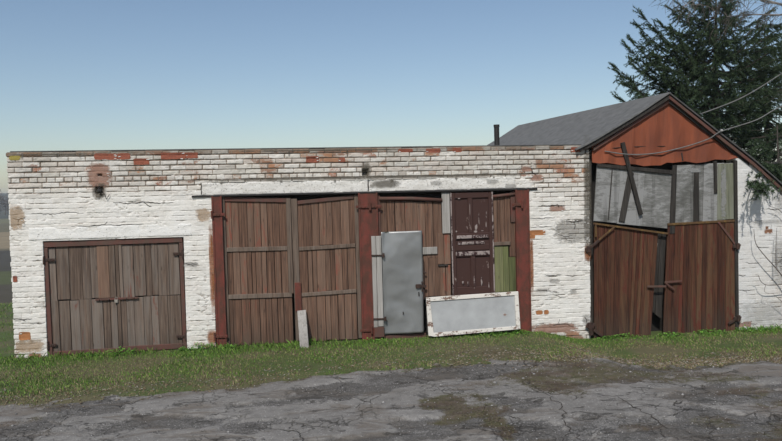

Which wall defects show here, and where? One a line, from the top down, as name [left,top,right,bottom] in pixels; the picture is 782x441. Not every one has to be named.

peeling [87,153,149,187]
peeling [10,207,25,230]
spalling [532,310,578,333]
crack [519,376,584,441]